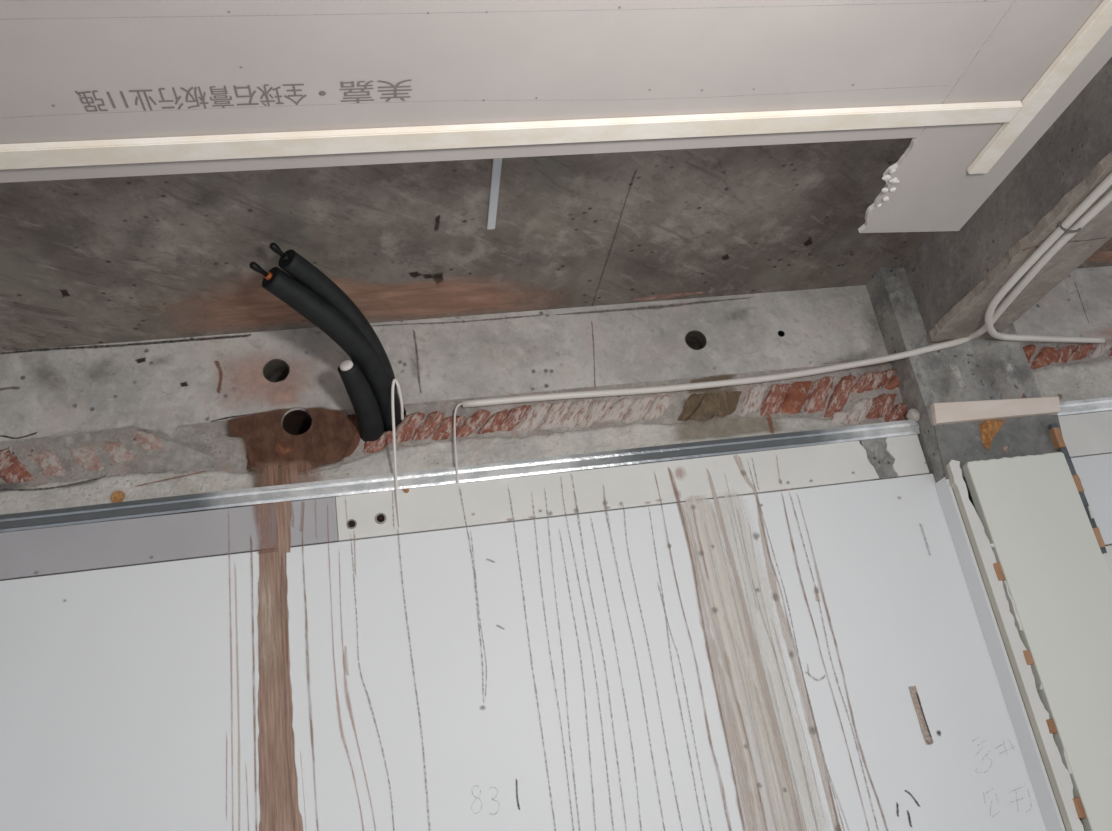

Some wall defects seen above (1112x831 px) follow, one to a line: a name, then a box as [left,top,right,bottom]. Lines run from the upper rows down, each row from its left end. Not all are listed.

spalling [877,169,900,207]
flaking render [344,360,908,458]
leakage [531,477,636,830]
leakage [618,574,665,831]
leakage [650,455,886,831]